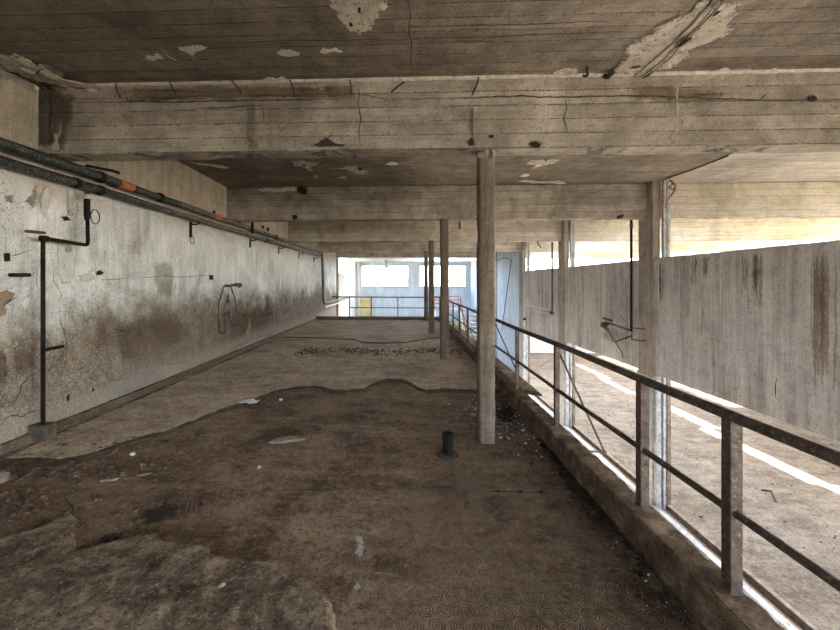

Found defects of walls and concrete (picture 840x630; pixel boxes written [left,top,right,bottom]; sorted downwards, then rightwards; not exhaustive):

spalling [329,0,389,35]
peeling [177,45,207,57]
peeling [276,48,300,57]
crack [408,0,622,76]
spalling [602,0,745,79]
spalling [0,53,100,93]
spalling [517,158,567,184]
peeling [0,291,16,316]
leakage [96,306,186,363]
leakage [216,293,276,350]